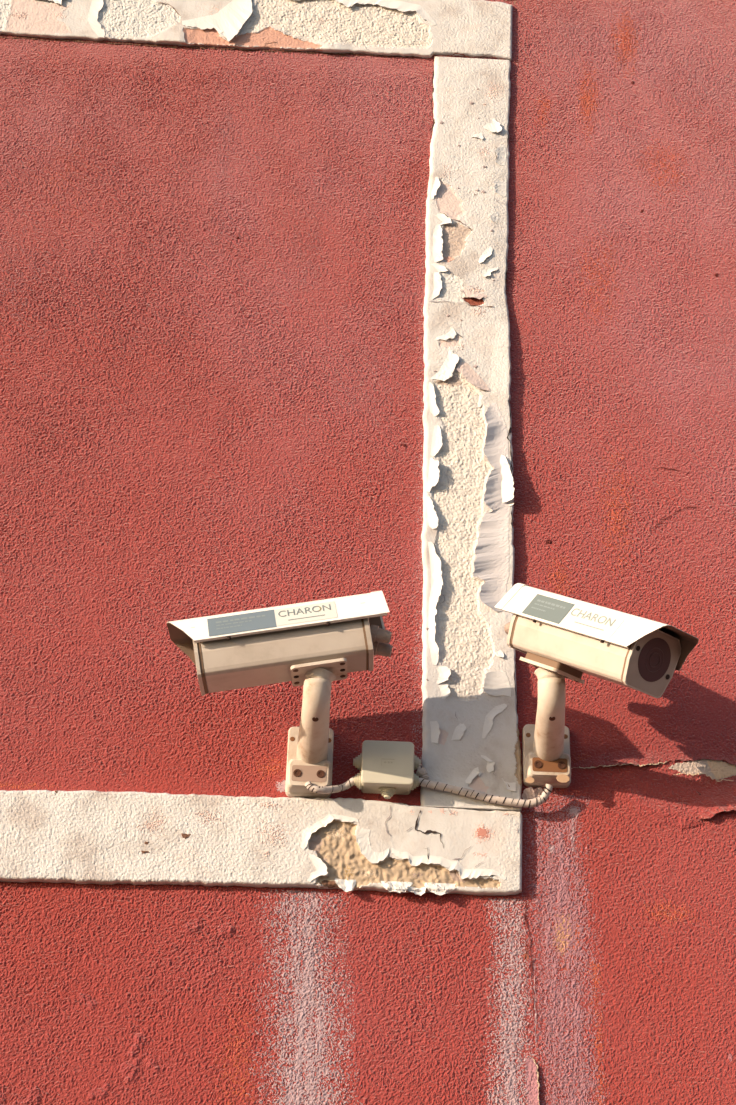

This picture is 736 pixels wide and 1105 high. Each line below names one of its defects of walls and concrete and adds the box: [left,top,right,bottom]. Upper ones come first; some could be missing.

peeling [0,0,72,37]
peeling [87,0,436,51]
peeling [472,117,506,168]
peeling [426,177,514,738]
peeling [465,755,495,784]
peeling [571,750,736,788]
spalling [300,814,506,896]
crack [385,803,484,867]